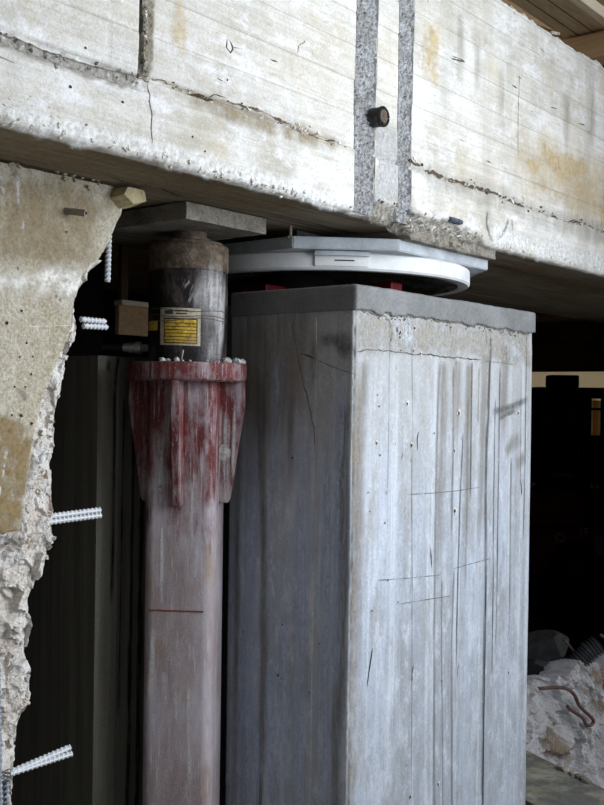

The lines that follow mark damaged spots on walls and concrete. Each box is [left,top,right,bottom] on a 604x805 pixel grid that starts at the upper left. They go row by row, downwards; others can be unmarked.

crack [132,0,347,147]
crack [408,156,604,233]
spalling [75,235,112,297]
spalling [368,199,604,273]
crack [358,309,530,364]
crack [292,324,353,451]
leakage [0,418,30,534]
spalling [0,308,109,805]
spalling [538,686,595,727]